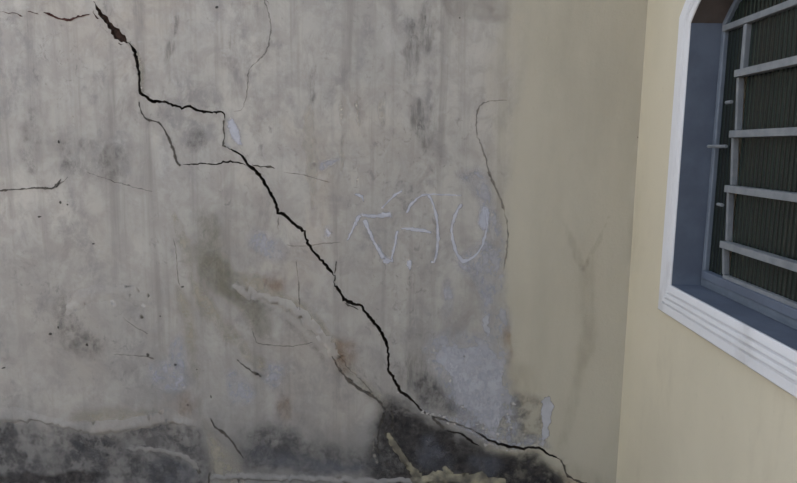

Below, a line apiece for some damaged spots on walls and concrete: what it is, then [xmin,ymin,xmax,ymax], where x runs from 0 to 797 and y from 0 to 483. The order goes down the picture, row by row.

crack [0,2,584,483]
water stain [0,427,109,483]
water stain [368,402,562,483]
peeling [433,337,525,449]